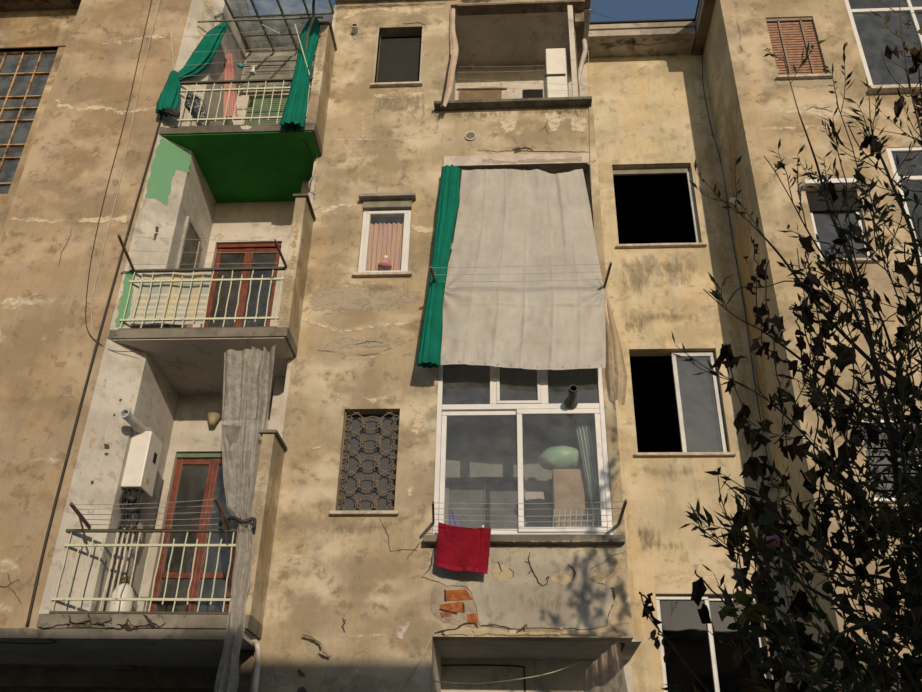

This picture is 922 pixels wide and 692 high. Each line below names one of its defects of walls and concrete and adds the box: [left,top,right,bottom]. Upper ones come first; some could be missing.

peeling [145,126,191,205]
crack [497,552,550,588]
flaking render [421,540,630,637]
spalling [38,613,166,631]
flaking render [301,634,332,660]